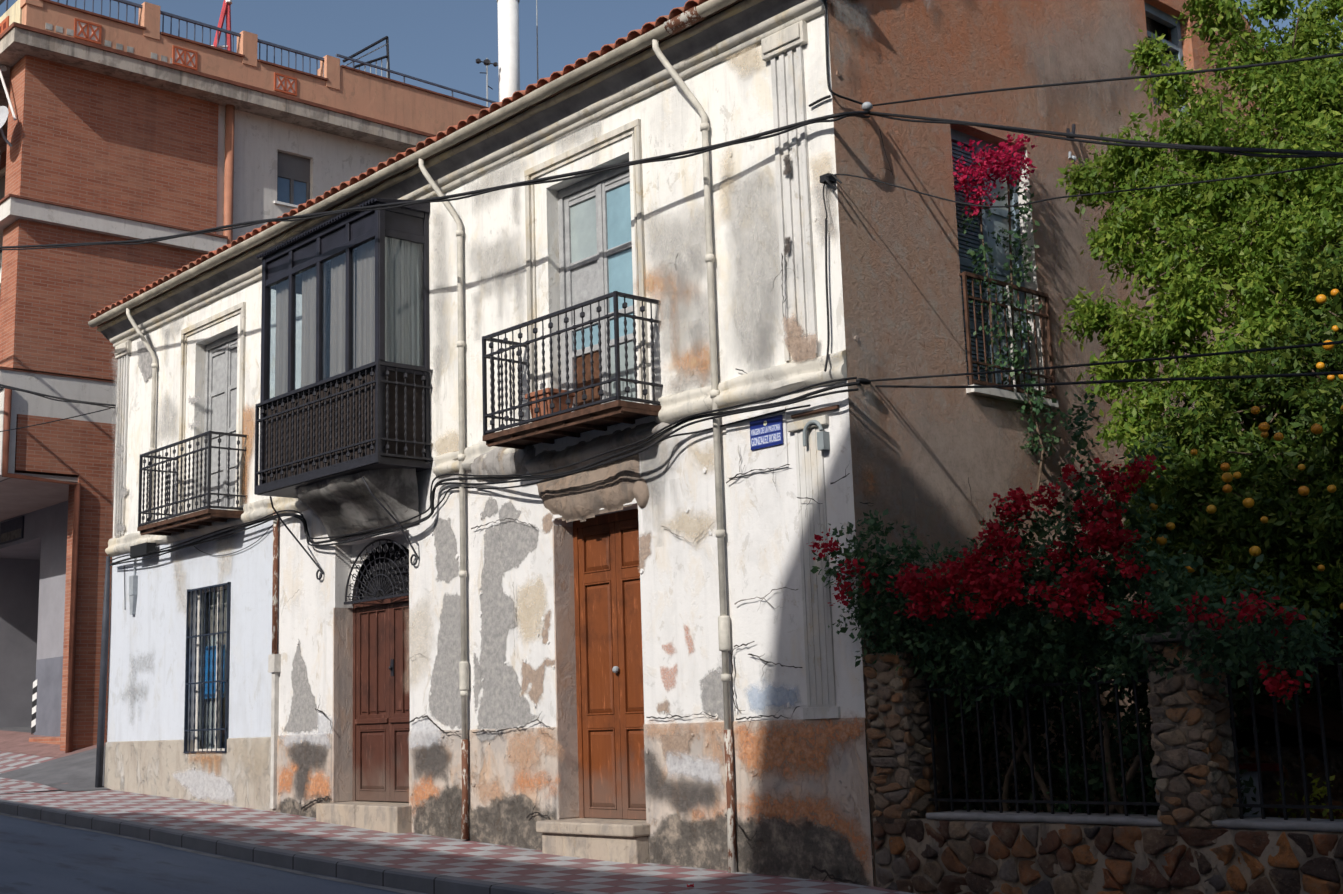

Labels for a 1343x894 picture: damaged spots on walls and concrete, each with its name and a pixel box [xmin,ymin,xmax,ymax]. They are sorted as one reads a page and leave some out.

spalling [277,765,330,818]
spalling [281,639,333,745]
water stain [289,739,327,799]
spalling [410,498,561,750]
spalling [648,667,724,762]
crack [646,587,802,735]
peeling [738,685,864,777]
spalling [648,793,873,886]